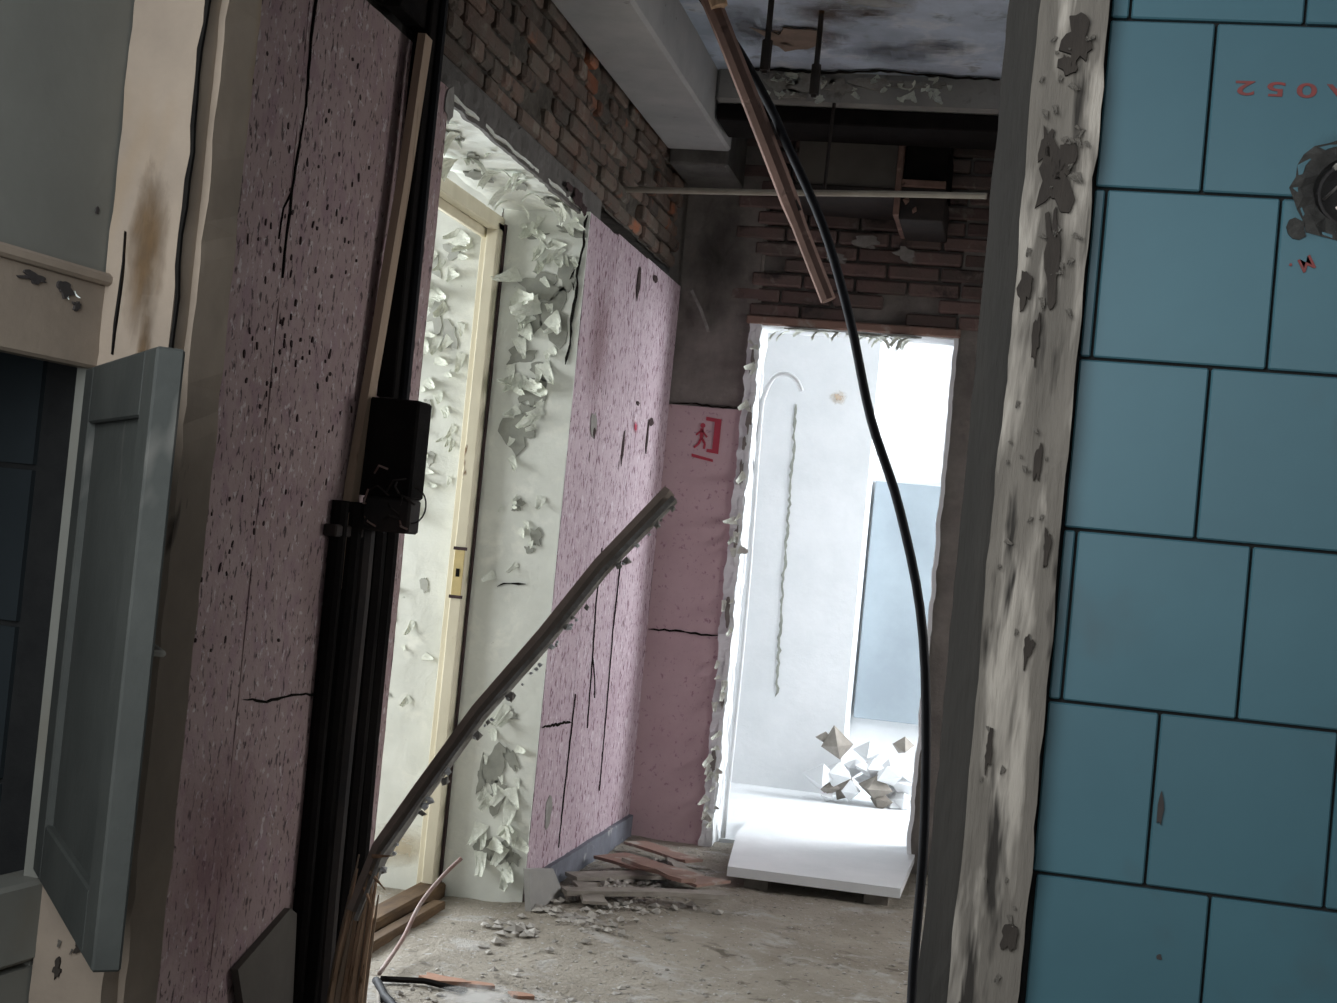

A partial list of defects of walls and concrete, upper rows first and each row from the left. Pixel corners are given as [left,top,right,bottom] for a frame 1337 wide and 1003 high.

crack [278,0,318,278]
spalling [1286,141,1337,241]
peeling [441,86,587,471]
peeling [419,228,474,488]
peeling [736,399,752,485]
peeling [723,513,748,557]
crack [650,628,718,636]
peeling [721,597,734,637]
crack [541,548,621,848]
peeling [711,660,728,712]
peeling [697,730,723,828]